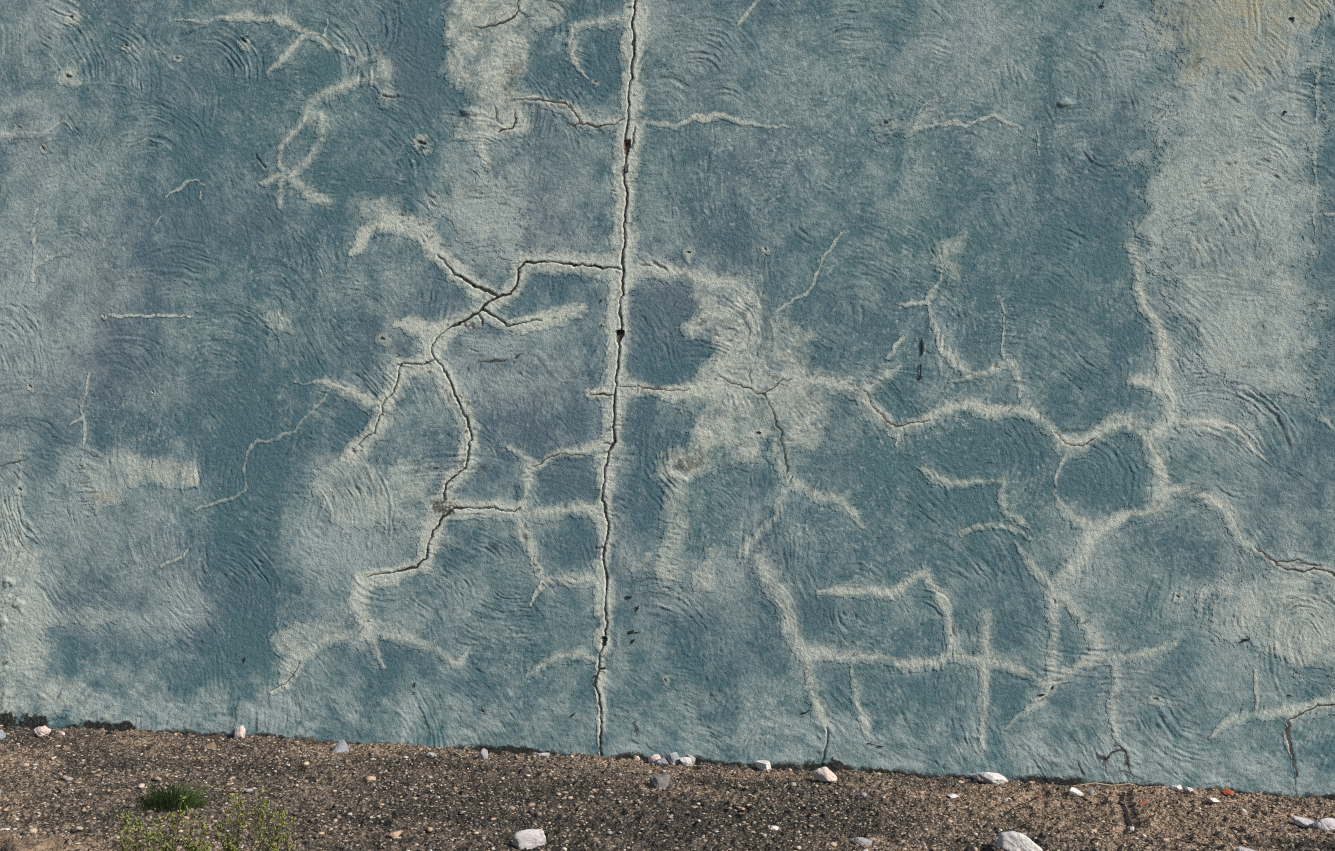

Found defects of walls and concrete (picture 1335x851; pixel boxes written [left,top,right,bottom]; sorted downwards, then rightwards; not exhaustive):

damp [155,179,205,226]
crack [357,0,688,756]
damp [174,0,1335,763]
crack [719,368,794,474]
crack [856,385,930,427]
crack [1255,547,1335,576]
damp [0,434,310,740]
damp [692,755,968,779]
damp [1005,773,1166,787]
damp [1197,784,1335,800]
crack [1286,704,1335,796]